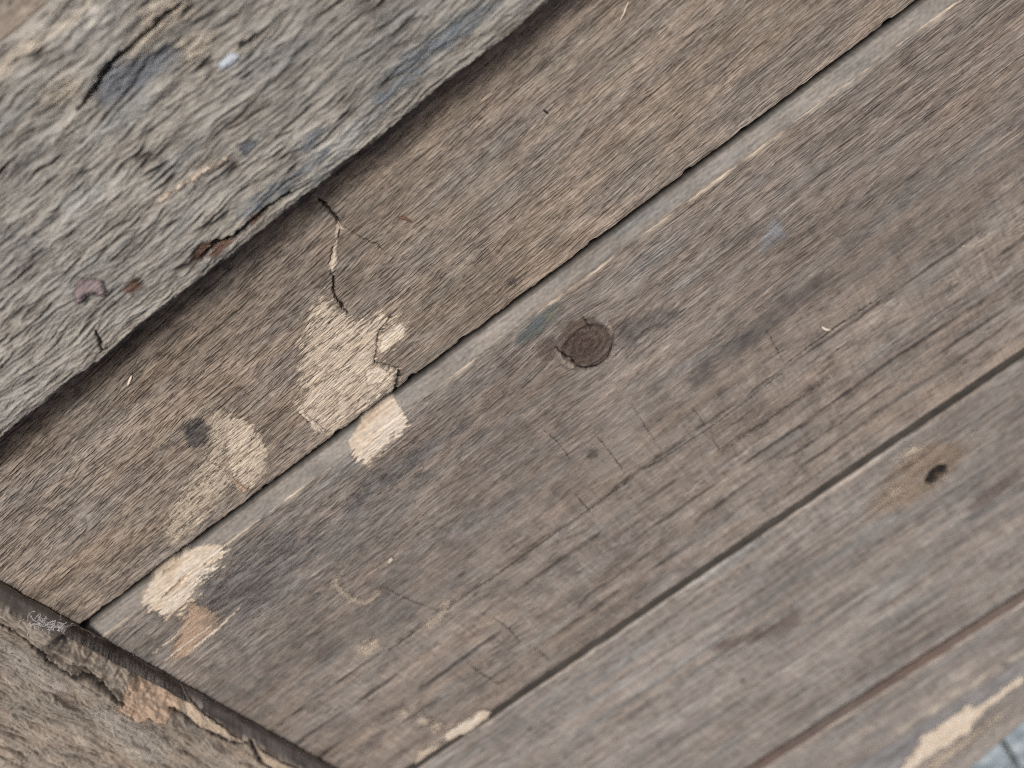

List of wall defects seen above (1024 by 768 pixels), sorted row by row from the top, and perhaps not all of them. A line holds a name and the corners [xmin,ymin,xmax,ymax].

crack [318,197,379,313]
peeling [292,295,414,468]
peeling [141,405,269,662]
peeling [902,675,1024,768]